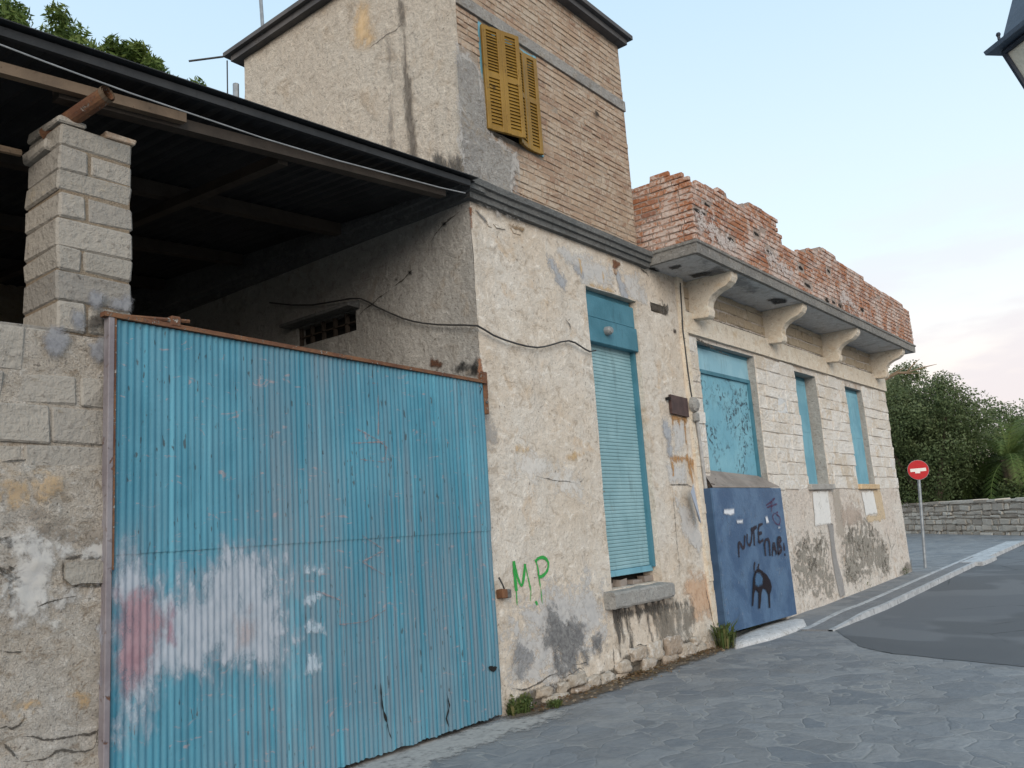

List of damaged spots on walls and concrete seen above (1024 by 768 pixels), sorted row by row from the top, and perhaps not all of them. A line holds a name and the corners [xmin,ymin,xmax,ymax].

water stain [398,0,417,156]
peeling [613,259,628,298]
corrosion [670,415,694,482]
water stain [512,642,535,680]
water stain [543,607,602,682]
water stain [613,598,696,656]
crack [1,719,98,762]